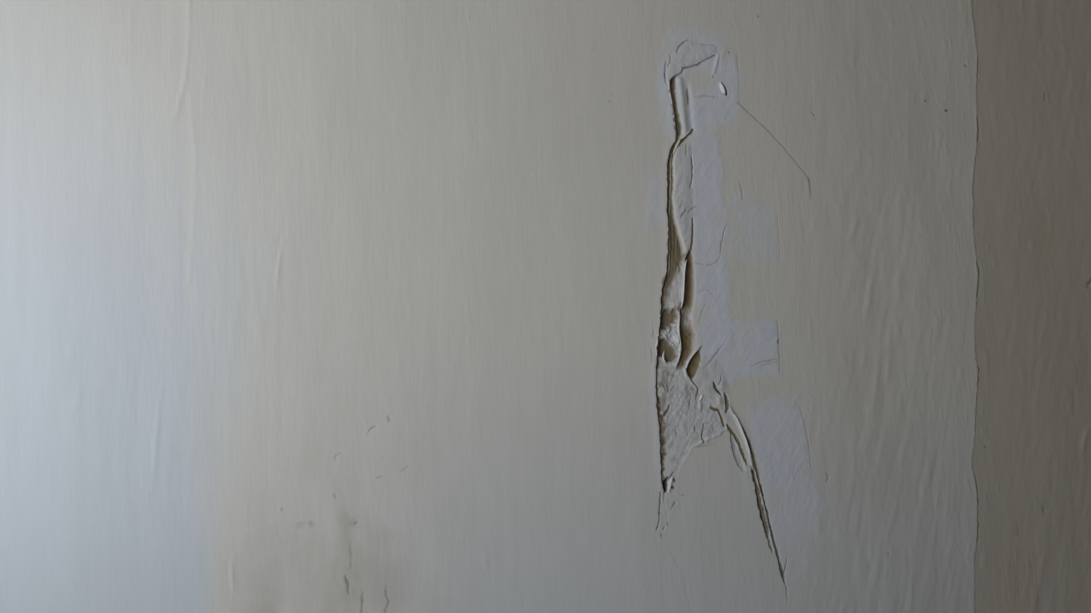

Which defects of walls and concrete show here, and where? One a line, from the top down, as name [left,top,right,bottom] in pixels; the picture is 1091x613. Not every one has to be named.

flaking render [641,39,789,613]